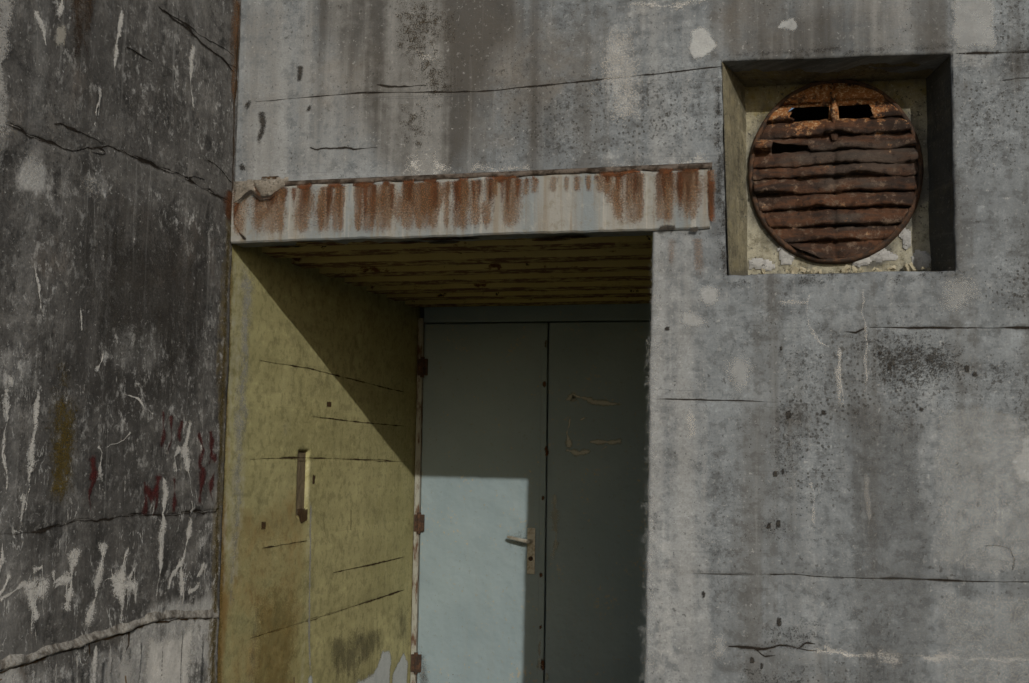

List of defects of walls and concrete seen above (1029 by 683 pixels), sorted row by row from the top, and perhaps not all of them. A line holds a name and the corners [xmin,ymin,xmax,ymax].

crack [956,51,1029,80]
crack [7,5,721,203]
corrosion [271,175,538,244]
corrosion [575,168,716,231]
leakage [2,372,14,489]
leakage [20,395,40,521]
leakage [51,230,232,683]
leakage [0,543,82,641]
crack [771,545,1029,582]
crack [0,618,211,673]
peeling [358,651,408,683]
crack [728,642,824,657]